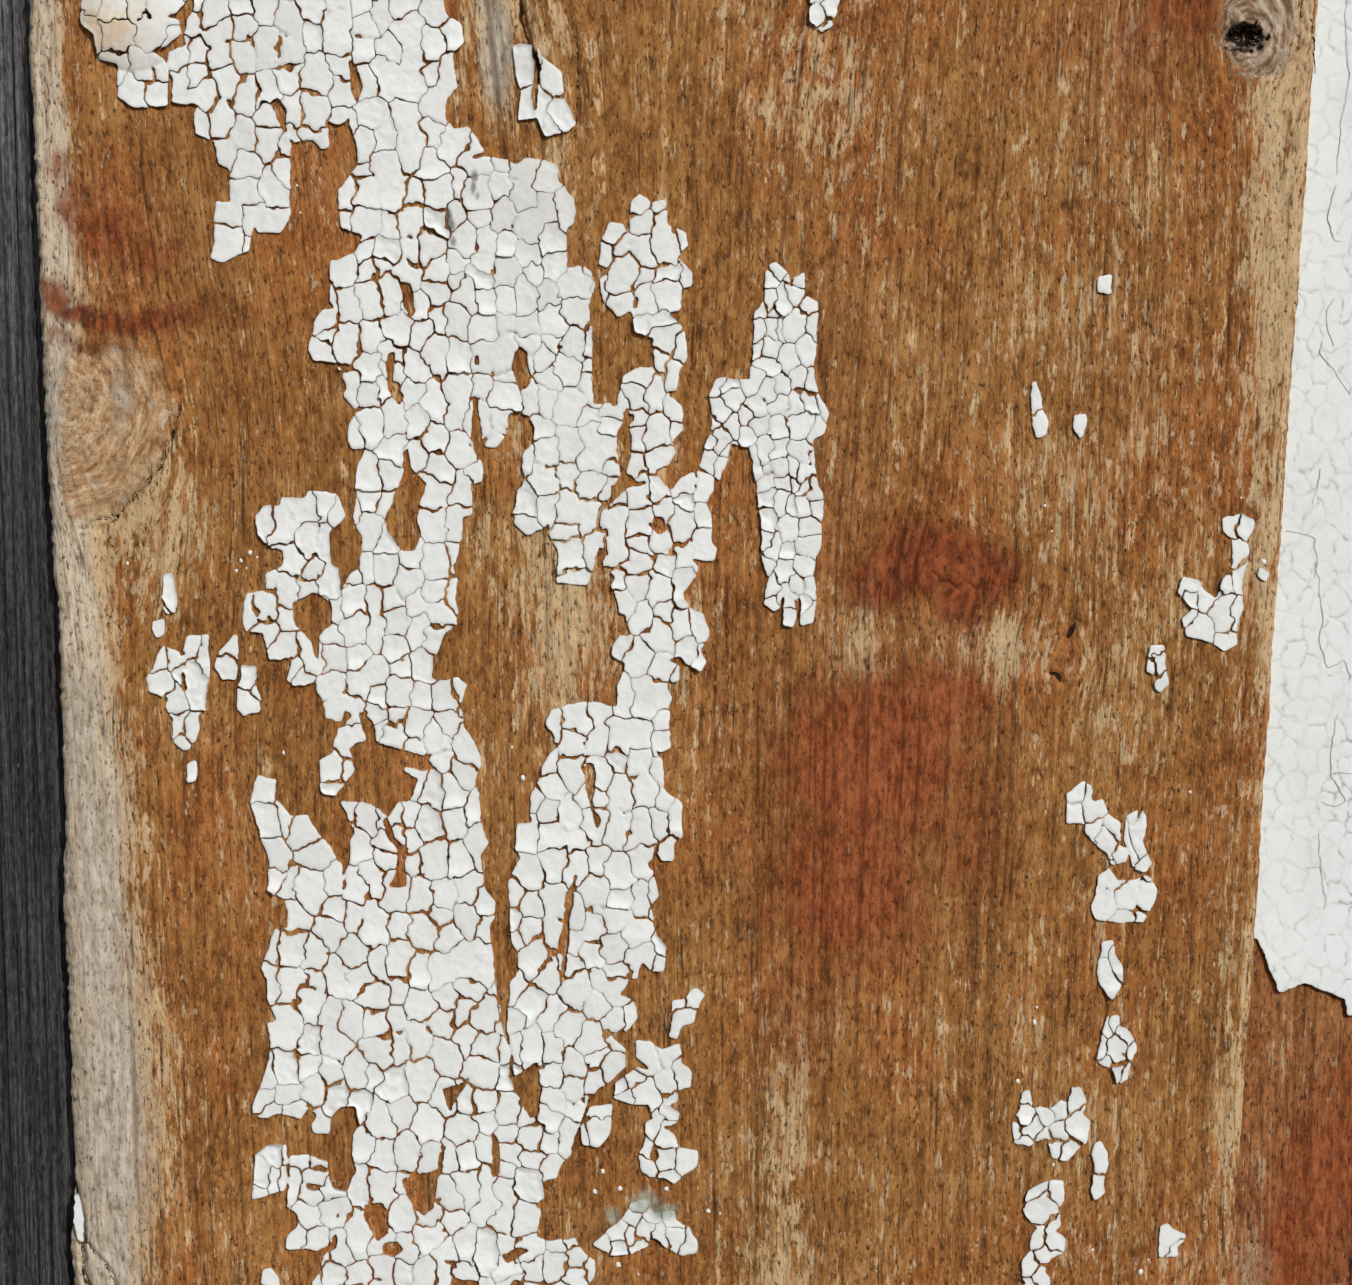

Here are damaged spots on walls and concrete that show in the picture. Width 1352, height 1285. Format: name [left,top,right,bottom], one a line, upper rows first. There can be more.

crack [519,0,542,83]
crack [573,31,581,137]
crack [1300,0,1350,242]
crack [1319,299,1350,394]
crack [84,393,180,529]
peeling [1178,0,1352,1015]
crack [1287,469,1352,678]
peeling [146,0,829,1285]
peeling [1066,781,1157,923]
peeling [1096,1015,1137,1084]
peeling [1012,1086,1109,1200]
peeling [1022,1180,1066,1285]